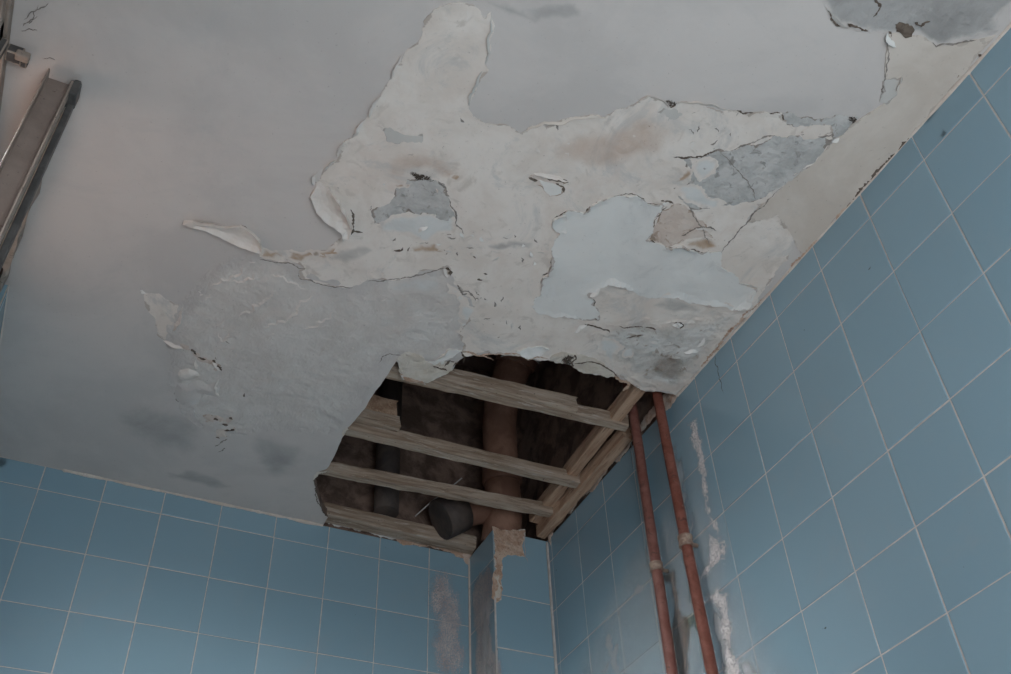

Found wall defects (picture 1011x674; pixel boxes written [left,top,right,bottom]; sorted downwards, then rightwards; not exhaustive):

peeling [231,2,859,432]
peeling [140,290,222,397]
flaking render [313,471,473,565]
damp [701,534,722,580]
damp [428,564,502,674]
rust [663,573,689,674]